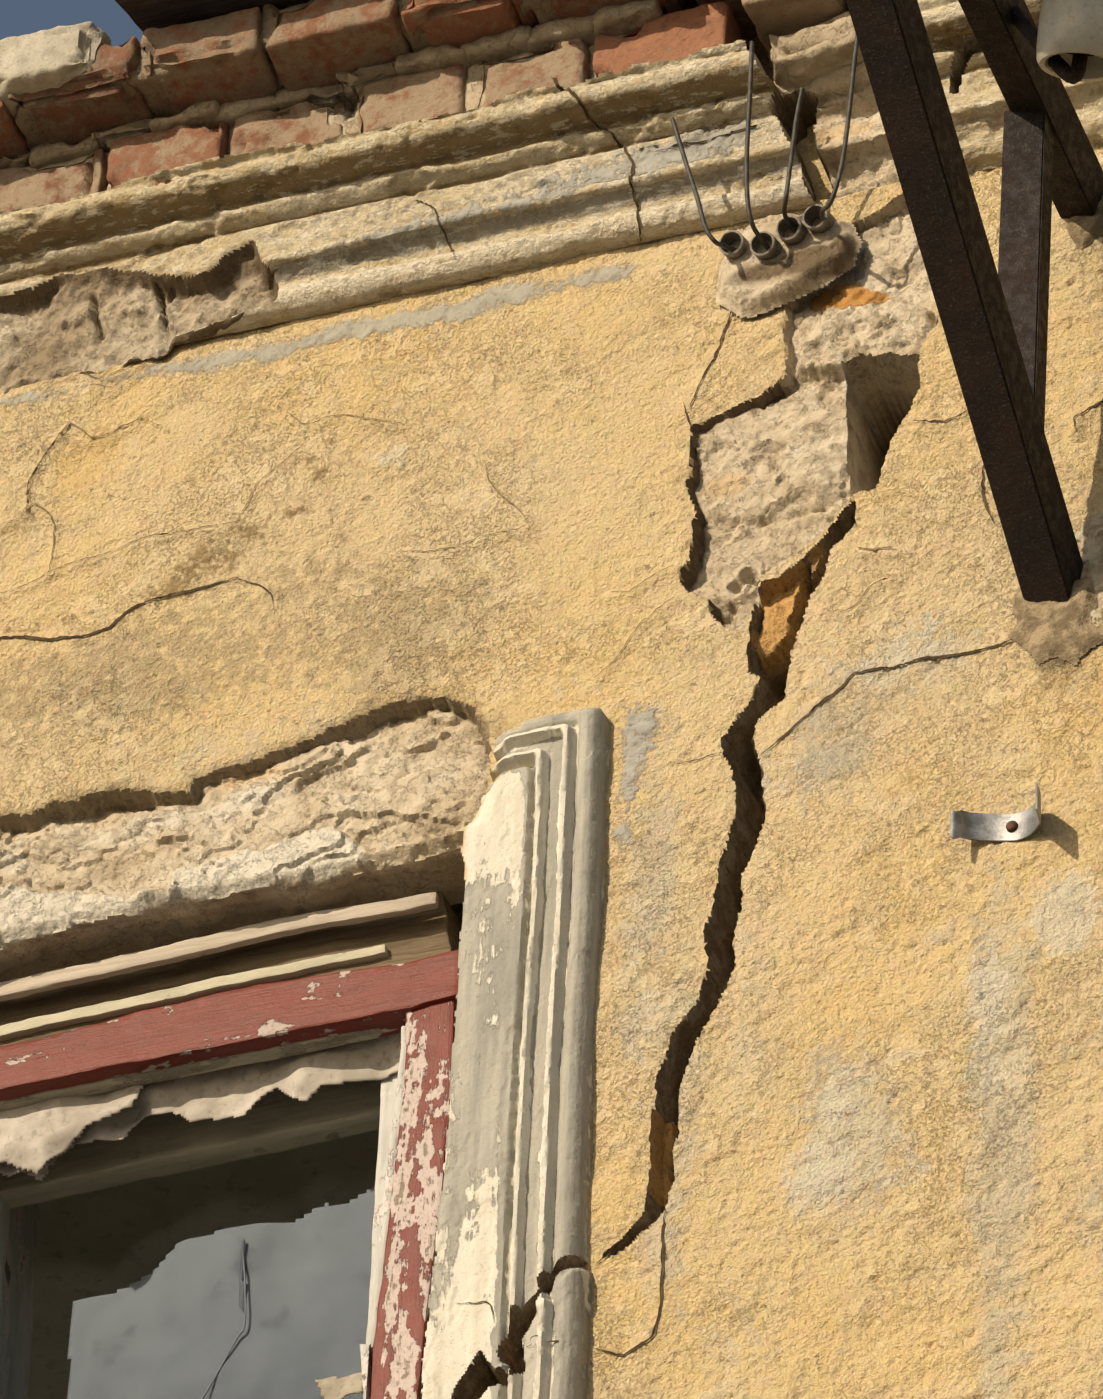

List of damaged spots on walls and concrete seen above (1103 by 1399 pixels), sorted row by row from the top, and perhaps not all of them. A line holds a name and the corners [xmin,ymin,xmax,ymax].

crack [551,77,769,240]
spalling [0,240,279,394]
spalling [595,53,939,677]
crack [0,577,274,641]
spalling [0,696,492,982]
crack [451,500,1014,1399]